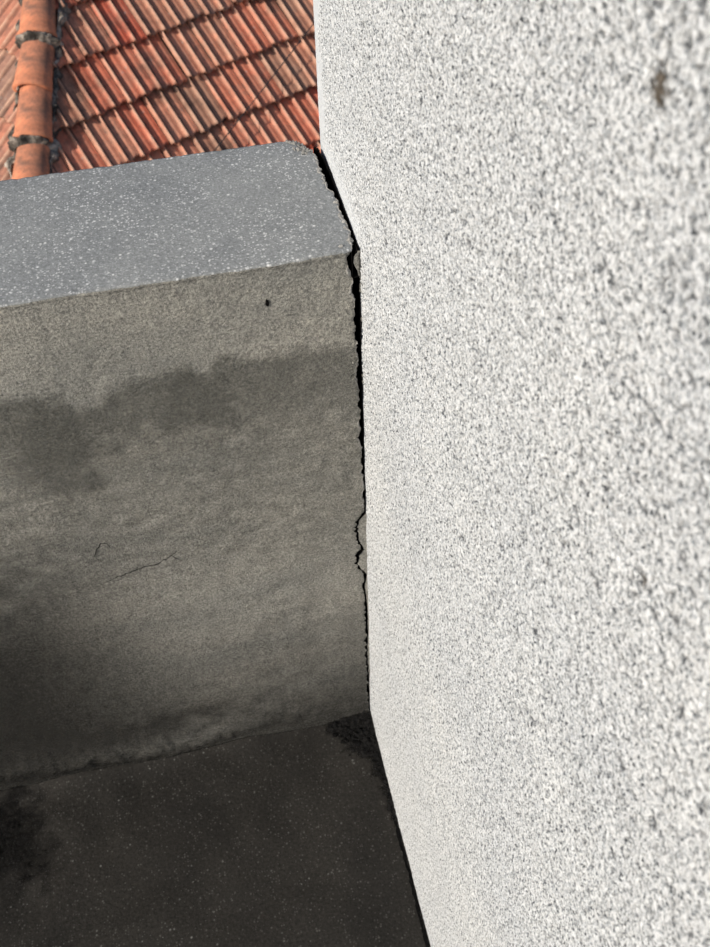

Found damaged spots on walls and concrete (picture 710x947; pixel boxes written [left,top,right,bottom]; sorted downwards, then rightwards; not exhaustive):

leakage [0,350,358,478]
crack [308,146,370,702]